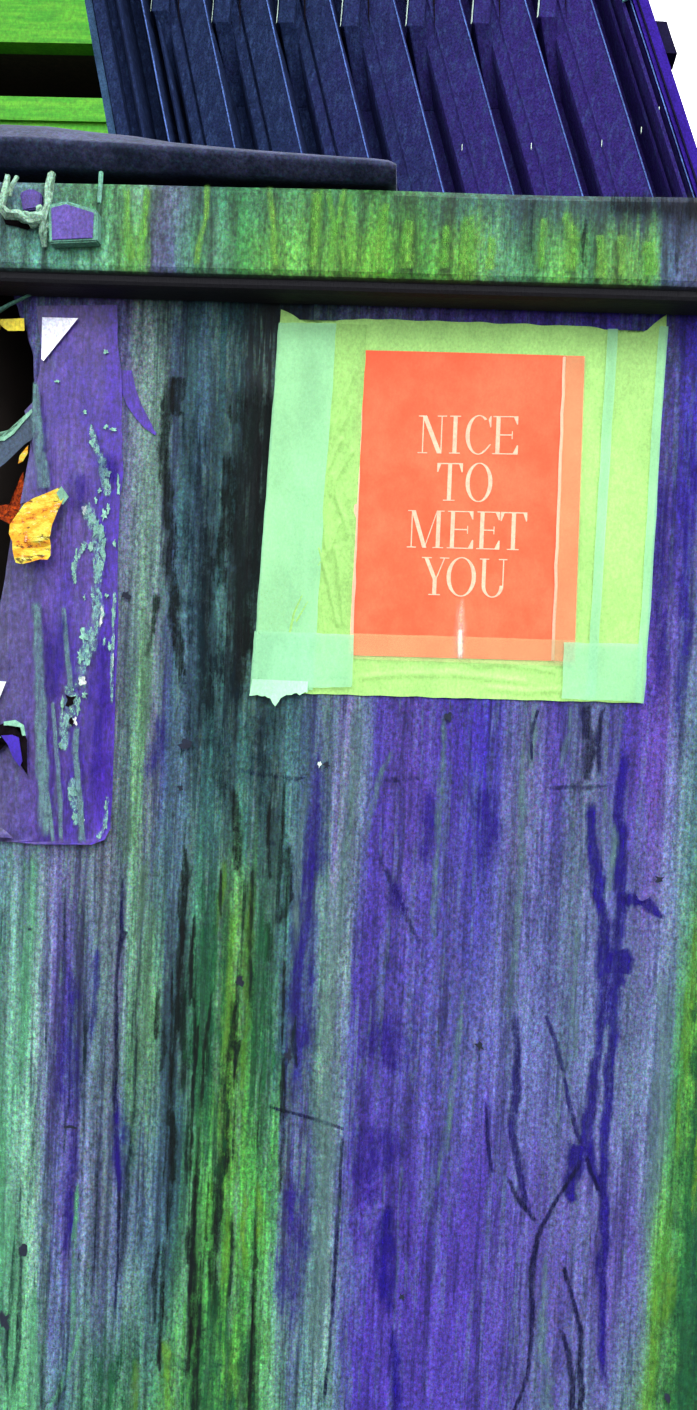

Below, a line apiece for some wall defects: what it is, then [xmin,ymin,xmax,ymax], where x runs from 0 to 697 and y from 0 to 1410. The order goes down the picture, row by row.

peeling [58,410,131,750]
peeling [68,778,85,825]
crack [485,756,662,1410]